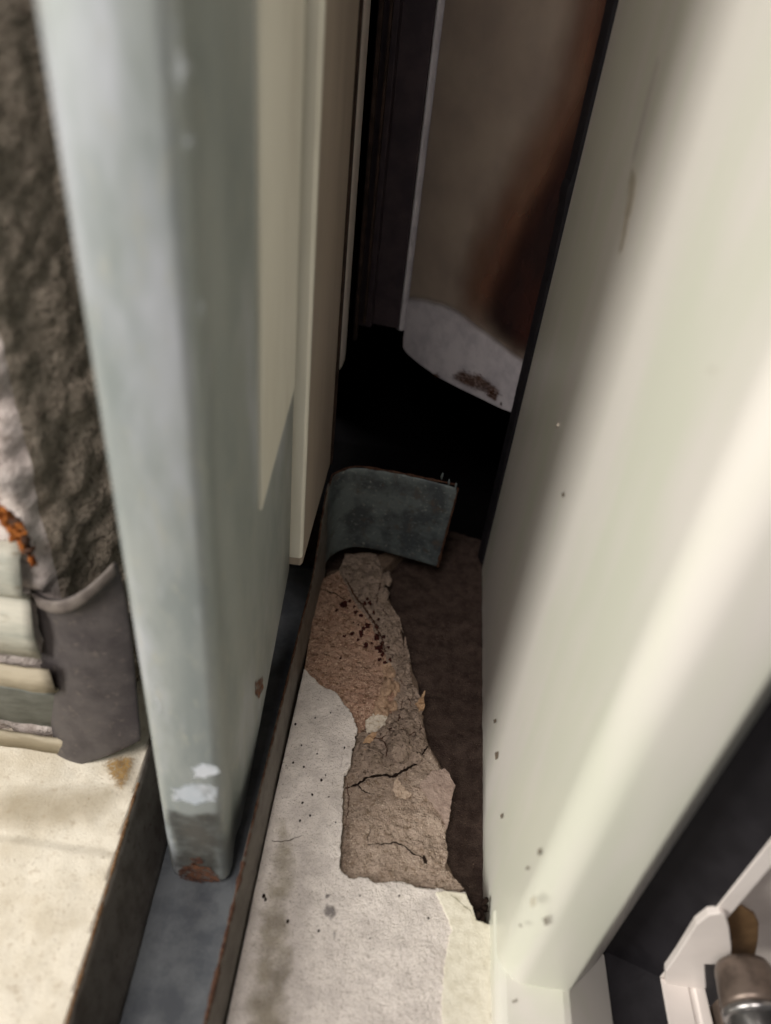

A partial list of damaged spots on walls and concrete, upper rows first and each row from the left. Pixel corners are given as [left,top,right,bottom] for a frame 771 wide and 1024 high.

rust [0,504,38,568]
crack [345,746,428,794]
flaking render [305,552,491,1024]
crack [367,826,428,864]
rust [178,858,220,883]